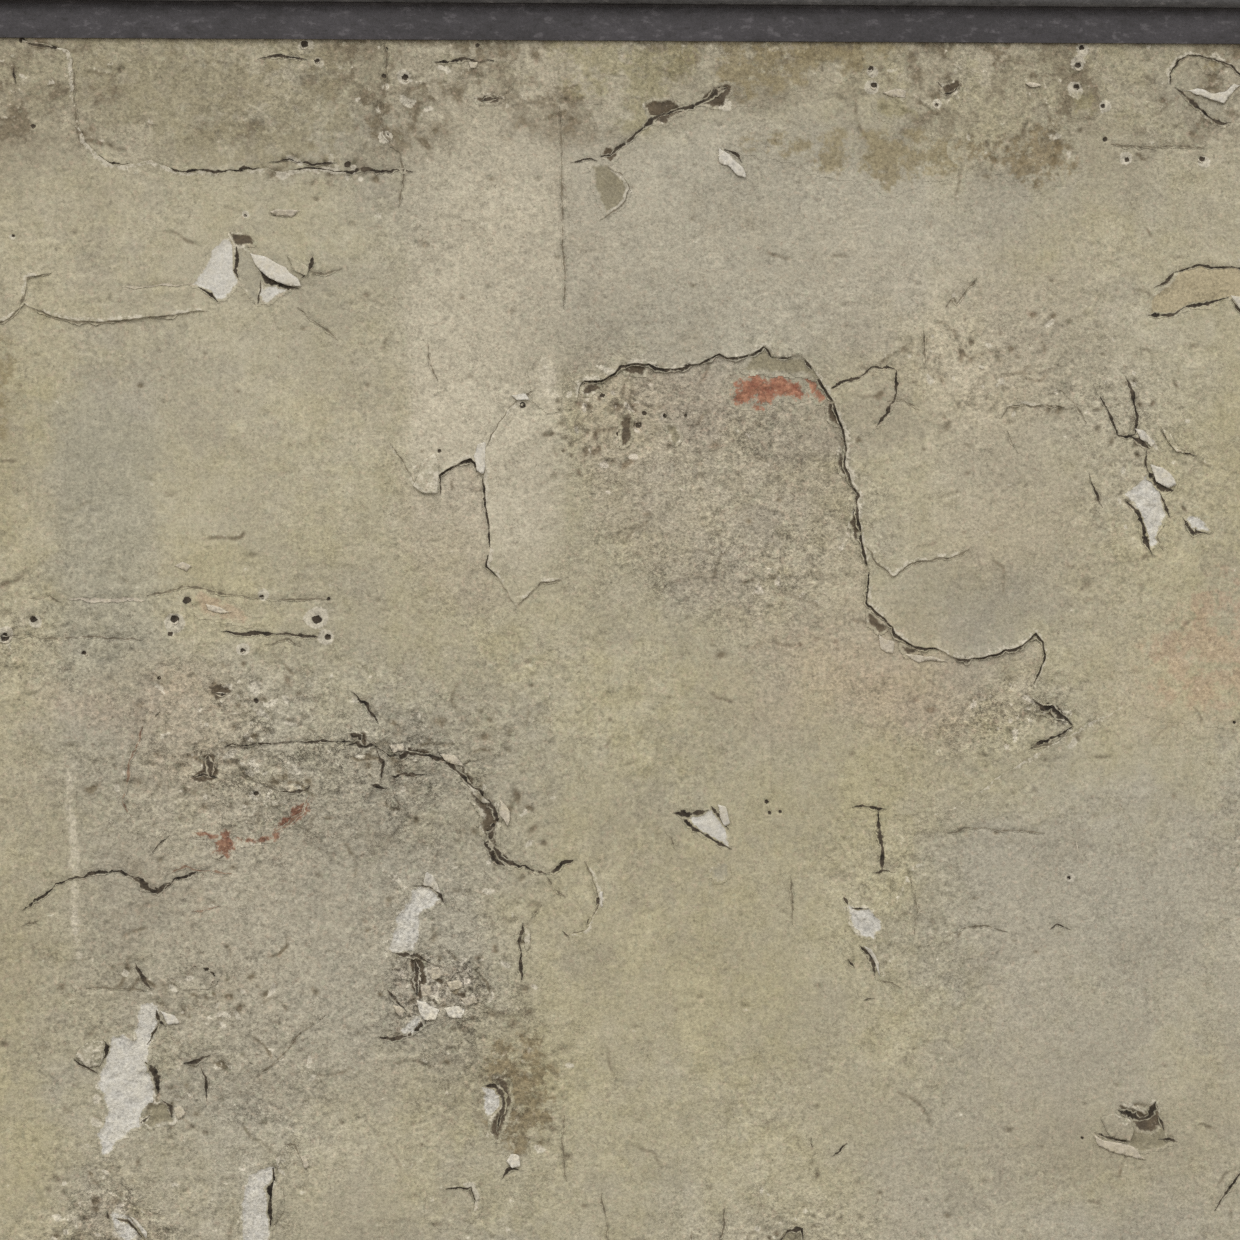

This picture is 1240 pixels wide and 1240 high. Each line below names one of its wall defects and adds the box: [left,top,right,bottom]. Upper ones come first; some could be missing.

crack [600,81,736,164]
peeling [0,214,342,326]
peeling [1100,377,1211,554]
crack [122,726,143,817]
crack [346,691,577,897]
crack [22,836,232,926]
peeling [673,805,732,884]
peeling [375,872,499,1043]
peeling [73,962,185,1157]
peeling [64,1180,182,1240]
peeling [238,1163,285,1240]
crack [1215,1172,1240,1210]